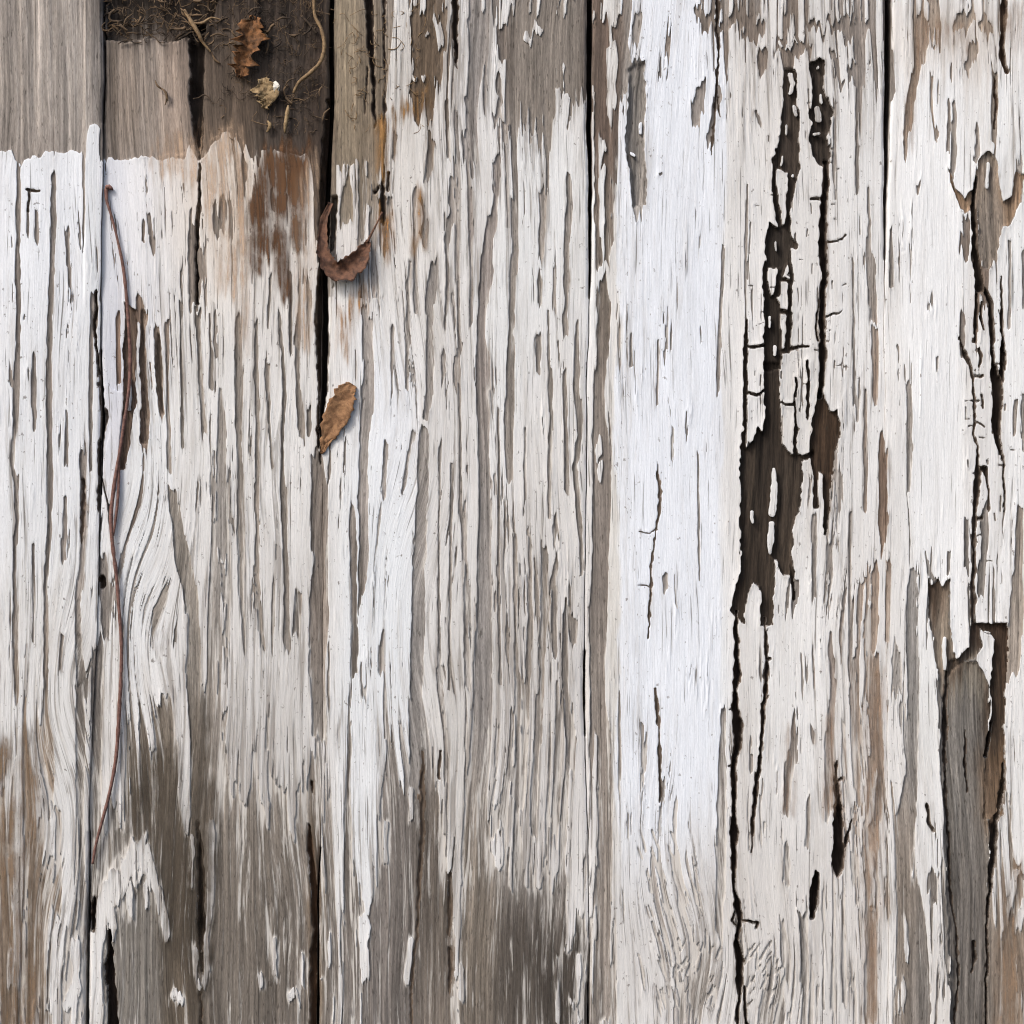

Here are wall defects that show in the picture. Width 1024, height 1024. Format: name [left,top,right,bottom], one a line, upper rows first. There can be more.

peeling [103,304,164,504]
crack [314,255,322,464]
crack [318,101,330,228]
peeling [625,61,647,208]
peeling [730,59,840,625]
crack [958,177,1006,624]
crack [729,609,771,1024]
peeling [928,579,1009,1024]